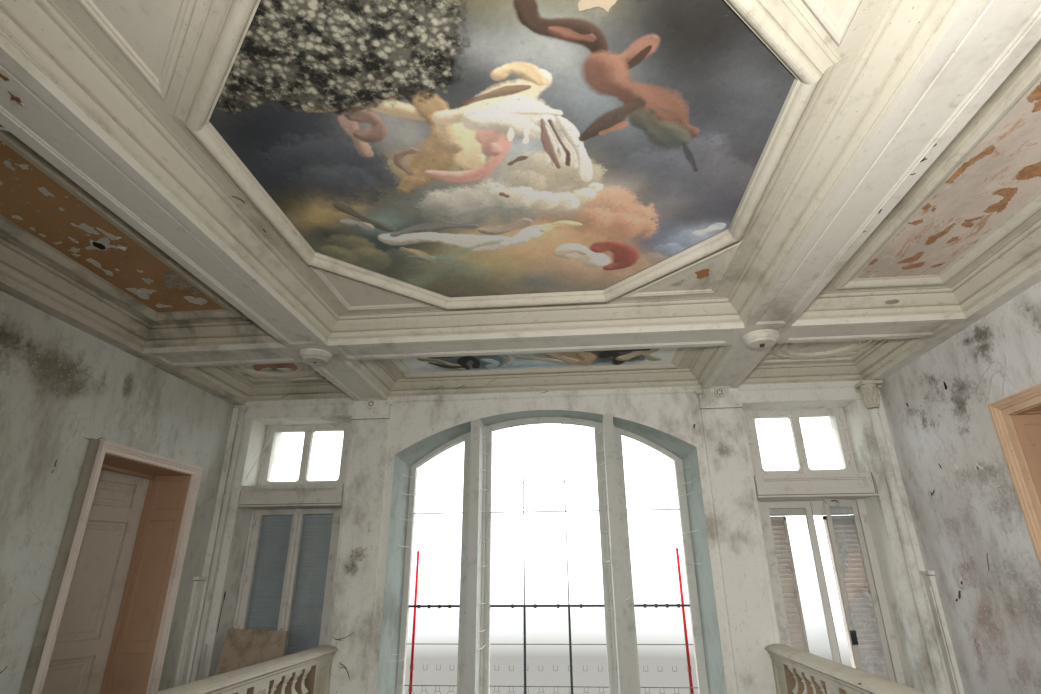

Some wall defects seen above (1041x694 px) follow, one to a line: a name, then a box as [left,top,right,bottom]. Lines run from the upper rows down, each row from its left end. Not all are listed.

flaking render [578,0,617,13]
peeling [0,73,25,107]
peeling [1027,84,1041,112]
peeling [945,145,995,184]
peeling [897,162,1041,270]
peeling [12,215,128,276]
peeling [126,270,172,308]
damp [965,327,988,354]
peeling [252,363,298,374]